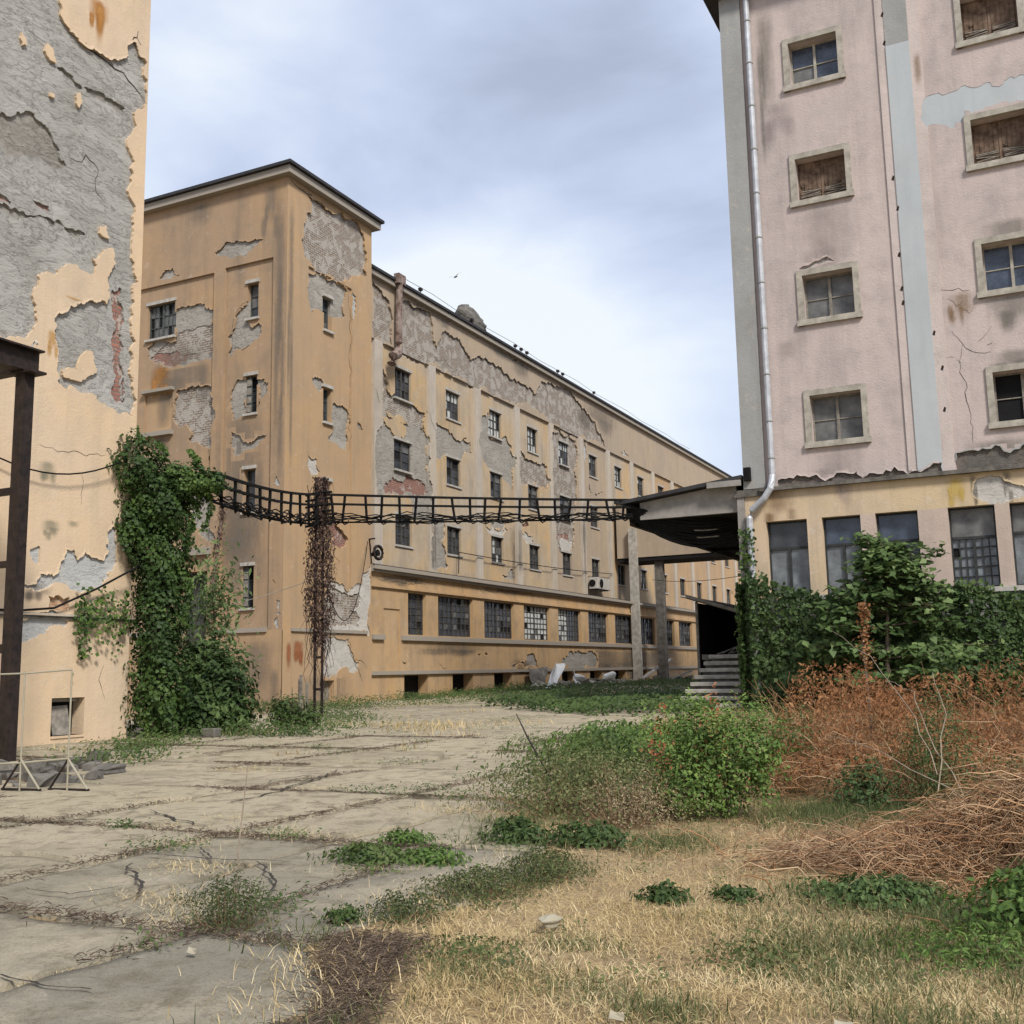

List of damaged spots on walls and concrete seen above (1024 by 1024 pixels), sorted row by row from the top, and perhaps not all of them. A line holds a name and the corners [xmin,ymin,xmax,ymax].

corrosion [90,1,104,35]
spalling [0,0,147,415]
spalling [147,302,213,368]
flaking render [174,384,215,449]
spalling [230,377,268,457]
flaking render [302,194,605,571]
crack [946,288,991,437]
spalling [777,443,1024,506]
spalling [22,524,118,642]
corrosion [287,642,302,663]
spalling [323,565,371,679]
crack [26,863,145,894]